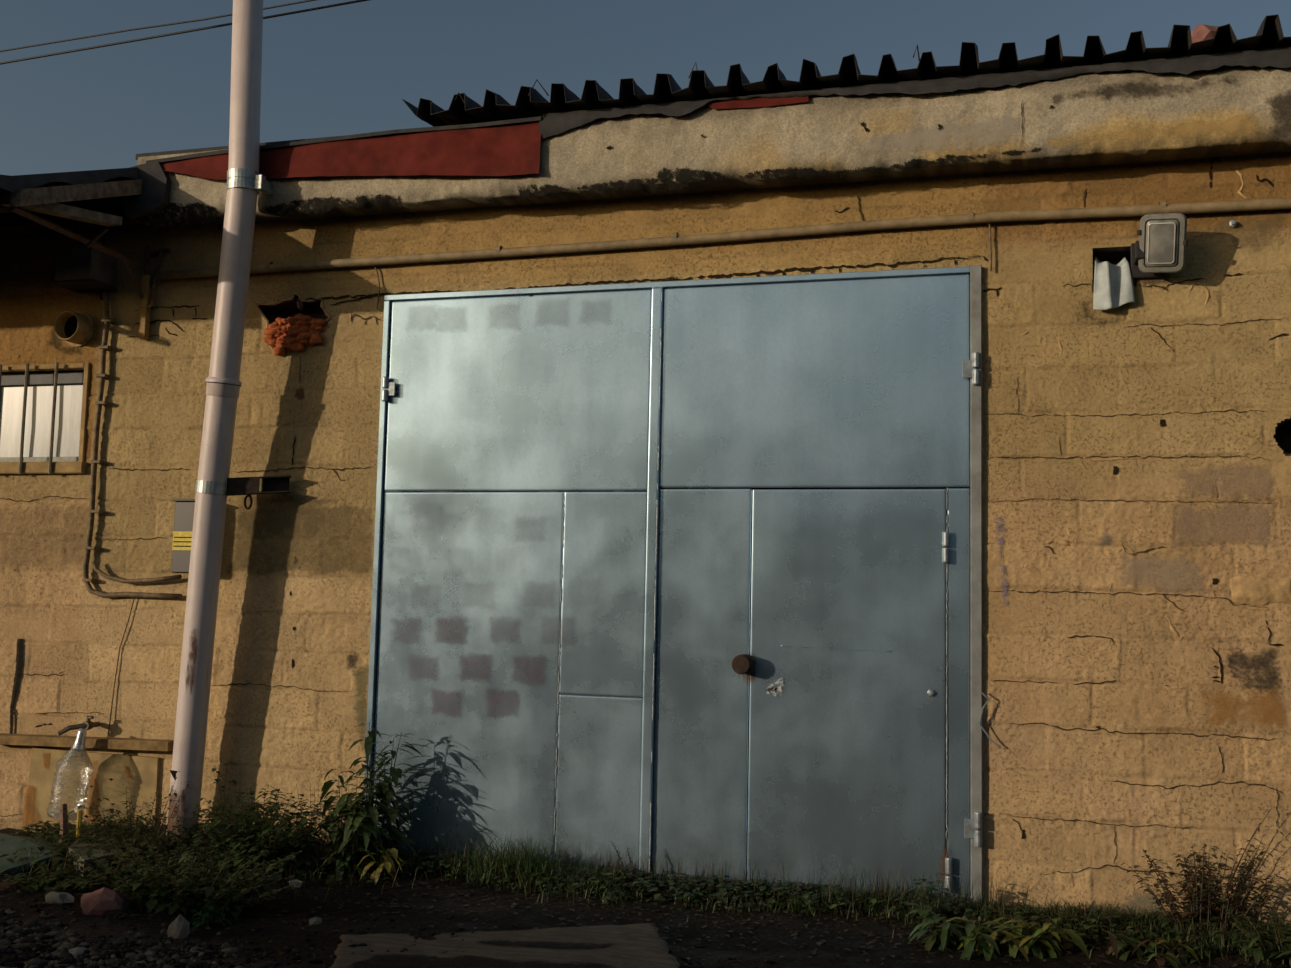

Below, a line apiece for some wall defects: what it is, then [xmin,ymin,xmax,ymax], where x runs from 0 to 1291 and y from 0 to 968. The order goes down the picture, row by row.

water stain [1053,80,1206,104]
water stain [1270,92,1291,137]
water stain [133,202,222,232]
water stain [262,194,403,215]
water stain [518,154,986,200]
spalling [254,292,332,356]
crack [986,377,1276,504]
crack [990,585,1284,646]
corrosion [186,634,197,692]
crack [1212,648,1223,684]
crack [1008,723,1284,827]
crack [1000,812,1282,886]